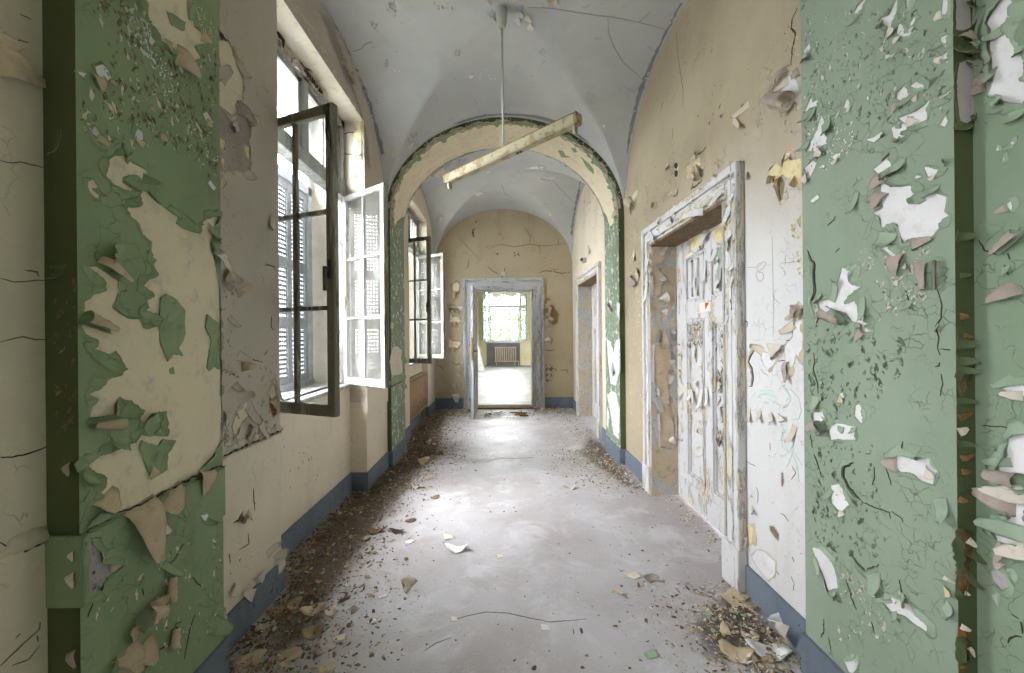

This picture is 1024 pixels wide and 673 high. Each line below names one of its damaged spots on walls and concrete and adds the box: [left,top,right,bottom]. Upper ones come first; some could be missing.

peeling [388,117,547,254]
crack [0,270,45,283]
peeling [44,0,349,673]
peeling [389,268,407,390]
crack [458,220,570,274]
peeling [525,134,748,459]
peeling [697,0,1024,642]
crack [0,447,46,458]
crack [791,435,903,521]
crack [0,527,49,555]
crack [846,558,905,631]
peeling [843,654,860,673]